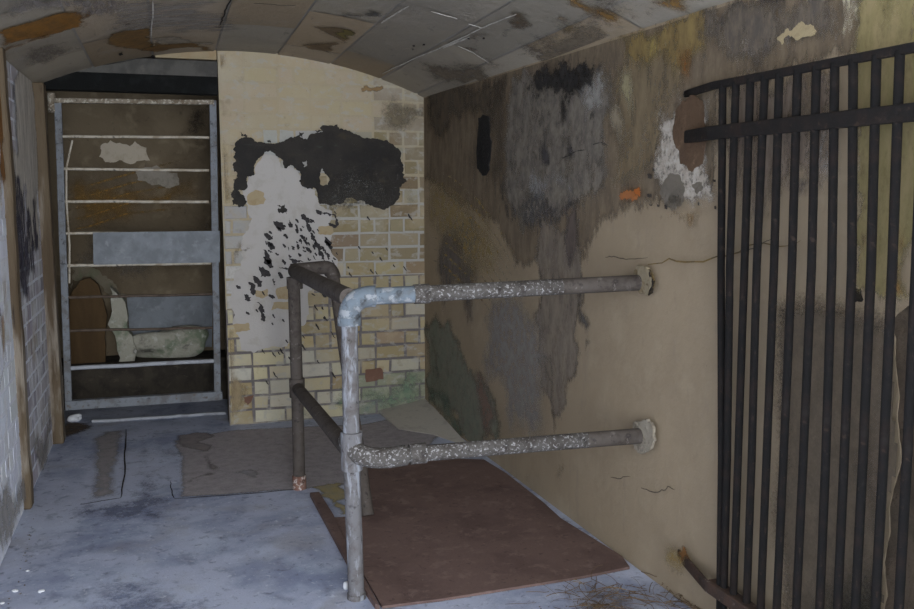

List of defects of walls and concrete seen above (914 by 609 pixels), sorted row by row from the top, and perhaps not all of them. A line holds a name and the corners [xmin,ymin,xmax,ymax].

peeling [699,0,837,65]
damp [382,0,860,284]
peeling [647,95,716,211]
peeling [229,124,407,353]
spalling [365,366,384,382]
damp [486,294,589,428]
crack [80,433,127,505]
flaking render [885,306,914,609]